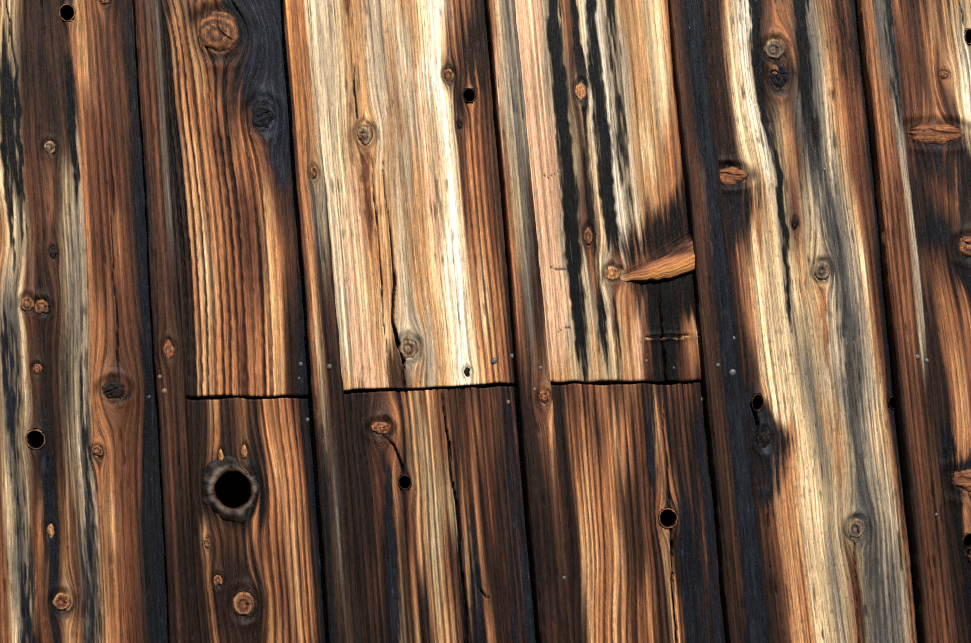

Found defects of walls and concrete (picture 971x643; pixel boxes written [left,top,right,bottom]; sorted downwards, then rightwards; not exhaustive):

crack [371,158,406,388]
crack [646,289,699,381]
crack [382,435,404,475]
crack [441,394,490,643]
crack [662,406,678,643]
crack [852,543,860,643]